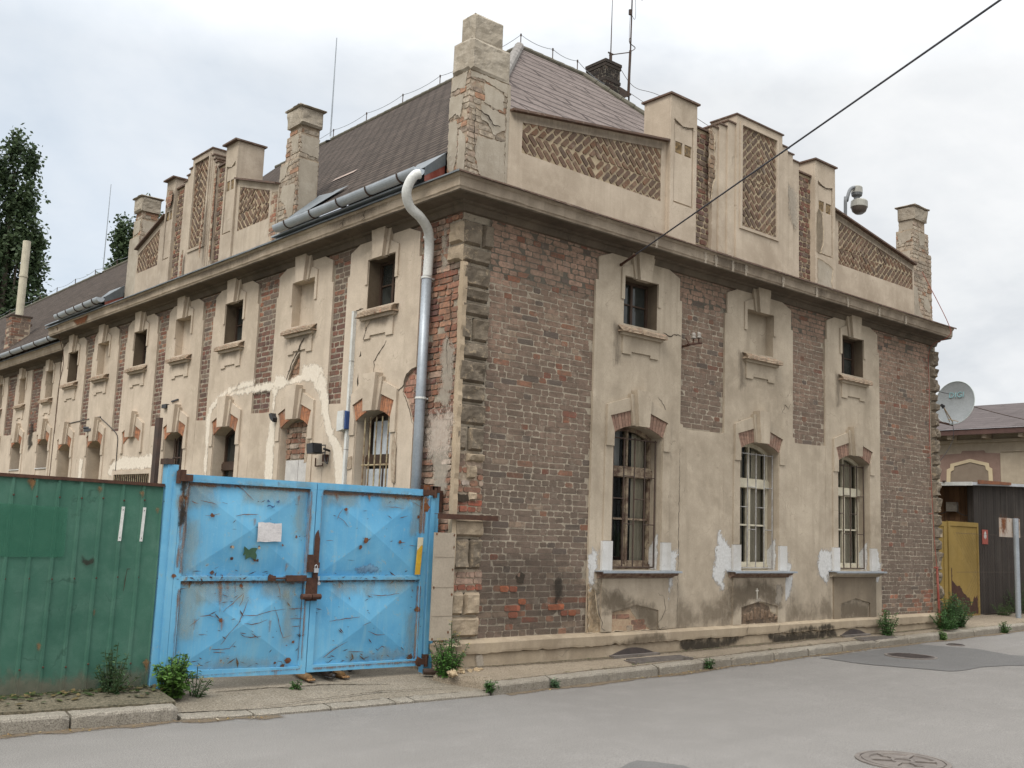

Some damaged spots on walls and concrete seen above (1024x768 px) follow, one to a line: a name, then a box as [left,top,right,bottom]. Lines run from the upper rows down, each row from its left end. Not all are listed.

flaking render [447,72,508,174]
flaking render [896,230,933,320]
rust [172,482,438,672]